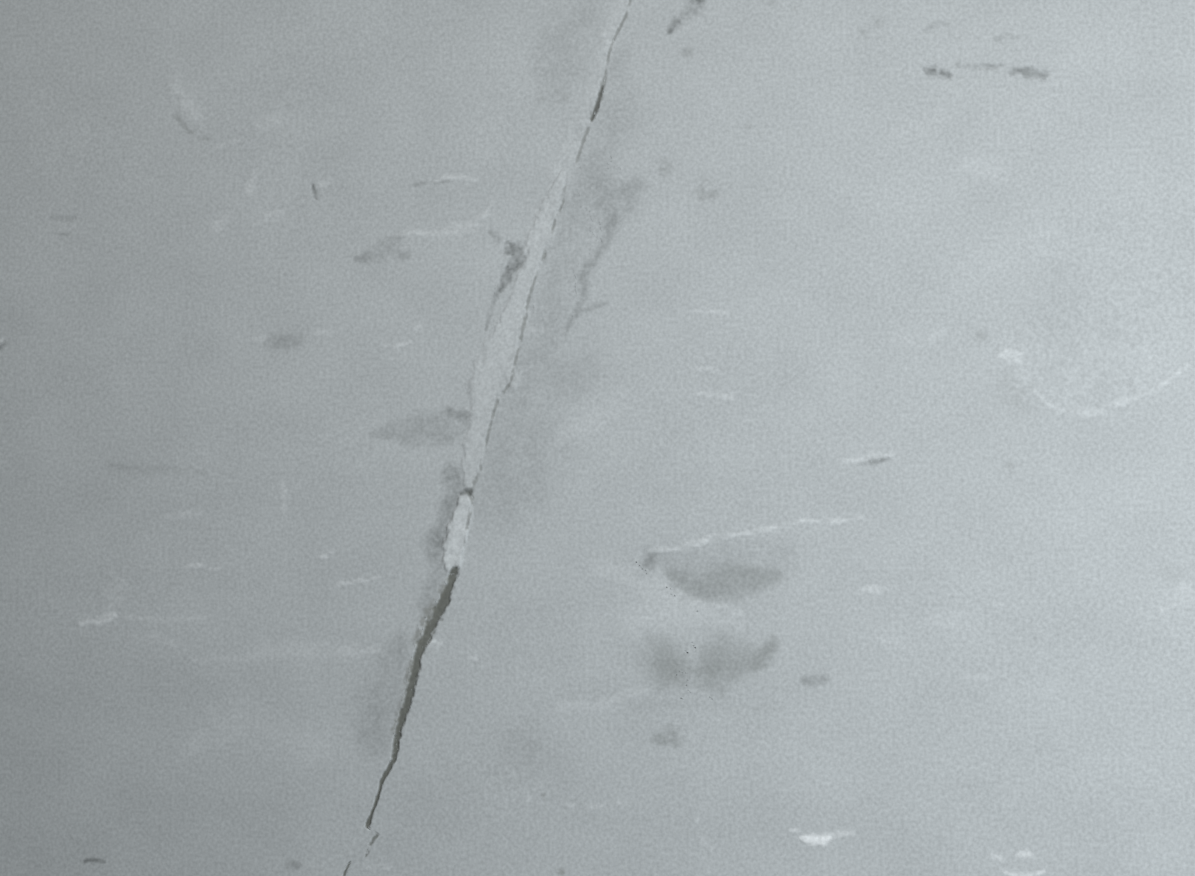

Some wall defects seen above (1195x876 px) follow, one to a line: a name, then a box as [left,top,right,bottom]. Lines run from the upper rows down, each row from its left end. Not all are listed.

crack [341,0,633,876]
leakage [629,620,784,707]